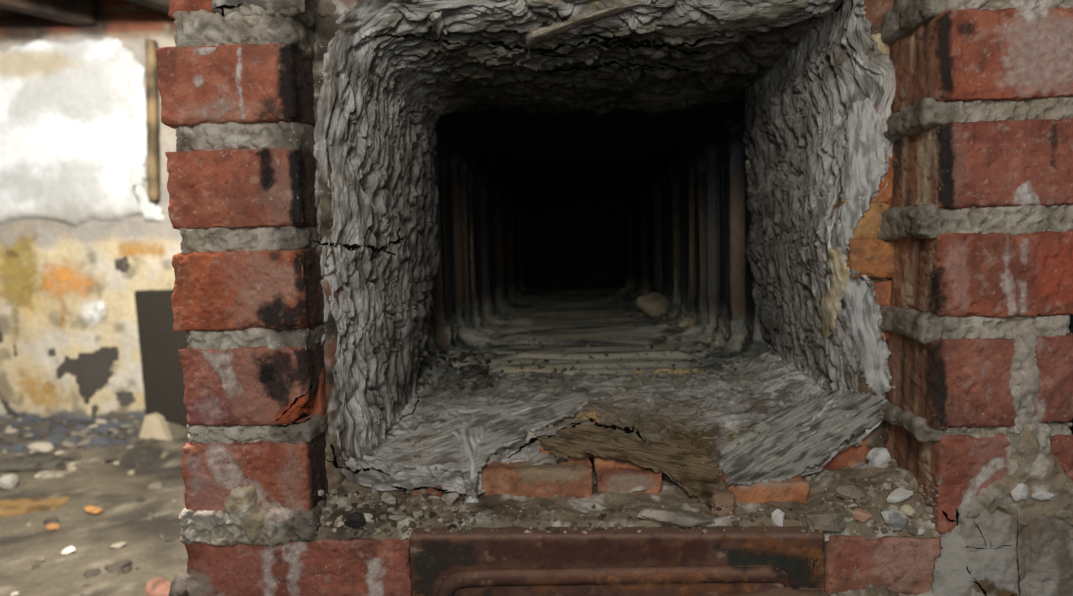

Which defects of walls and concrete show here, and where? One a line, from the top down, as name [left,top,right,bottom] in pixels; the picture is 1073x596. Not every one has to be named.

damp [1000,0,1073,95]
crack [313,228,405,255]
damp [1,237,36,334]
damp [82,301,105,322]
flaking render [48,347,135,417]
spalling [275,386,314,427]
crack [508,417,646,459]
crack [327,444,452,493]
damp [260,541,306,596]
damp [367,558,385,596]
crack [942,508,1020,596]